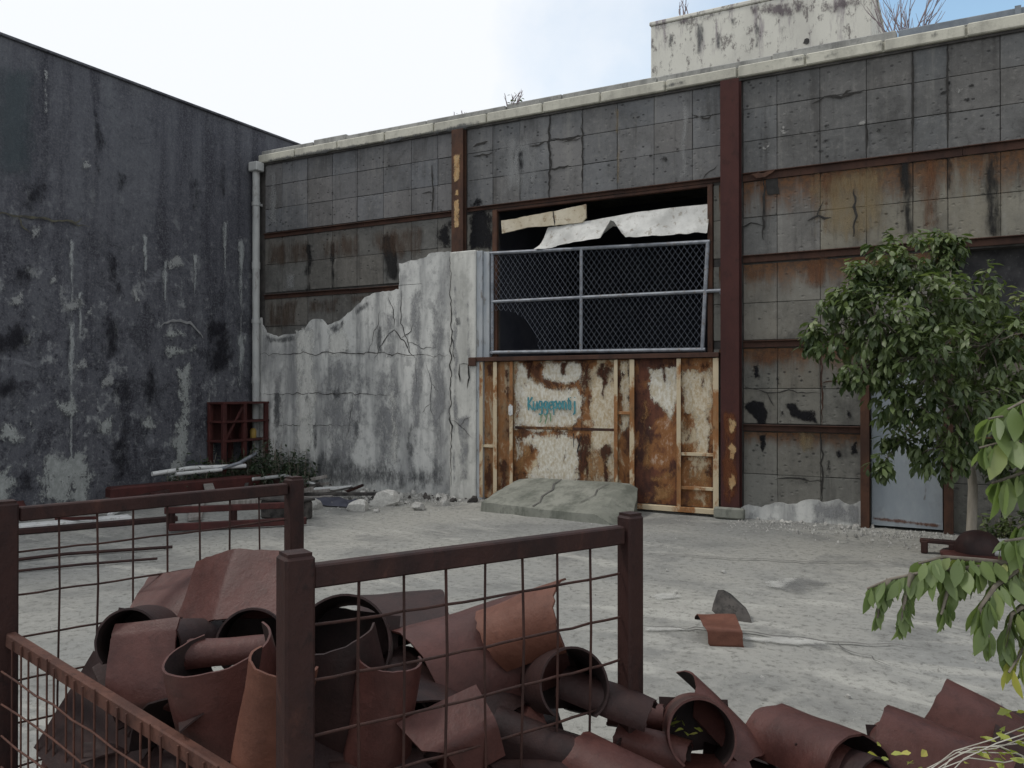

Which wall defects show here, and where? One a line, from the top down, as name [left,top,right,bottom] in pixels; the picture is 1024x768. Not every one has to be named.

water stain [751,4,801,46]
crack [808,189,858,237]
water stain [0,324,31,352]
water stain [68,241,82,456]
water stain [207,222,246,385]
crack [262,259,471,474]
rust [485,441,531,491]
rust [522,361,612,482]
rust [683,412,737,505]